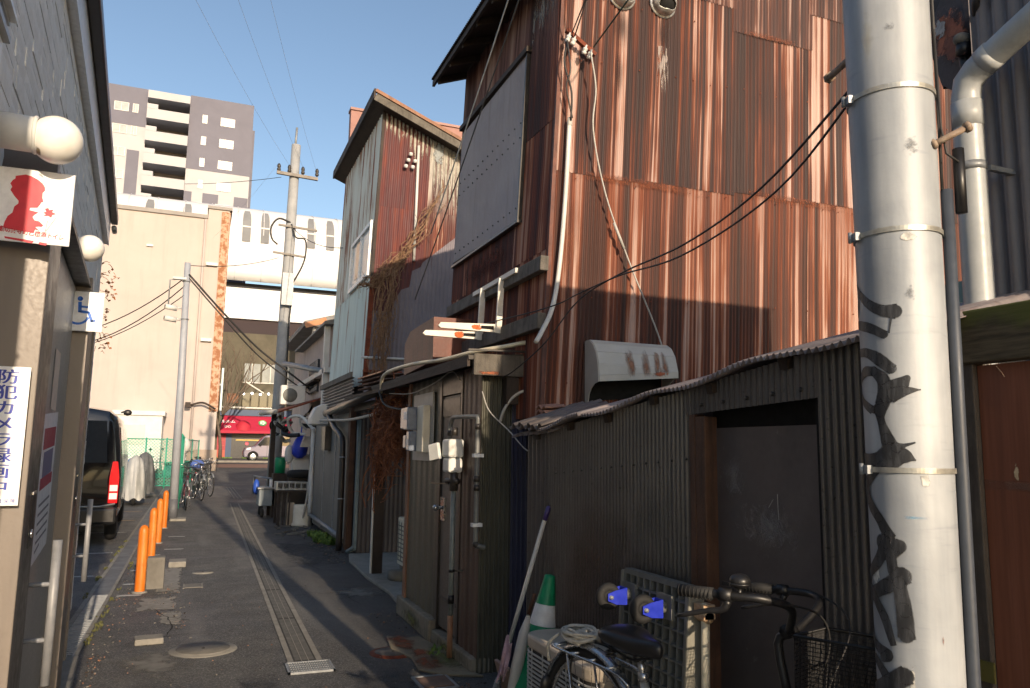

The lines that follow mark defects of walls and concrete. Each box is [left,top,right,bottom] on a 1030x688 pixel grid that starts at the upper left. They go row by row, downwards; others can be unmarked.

rust [658,24,668,84]
rust [931,8,966,63]
rust [627,353,668,376]